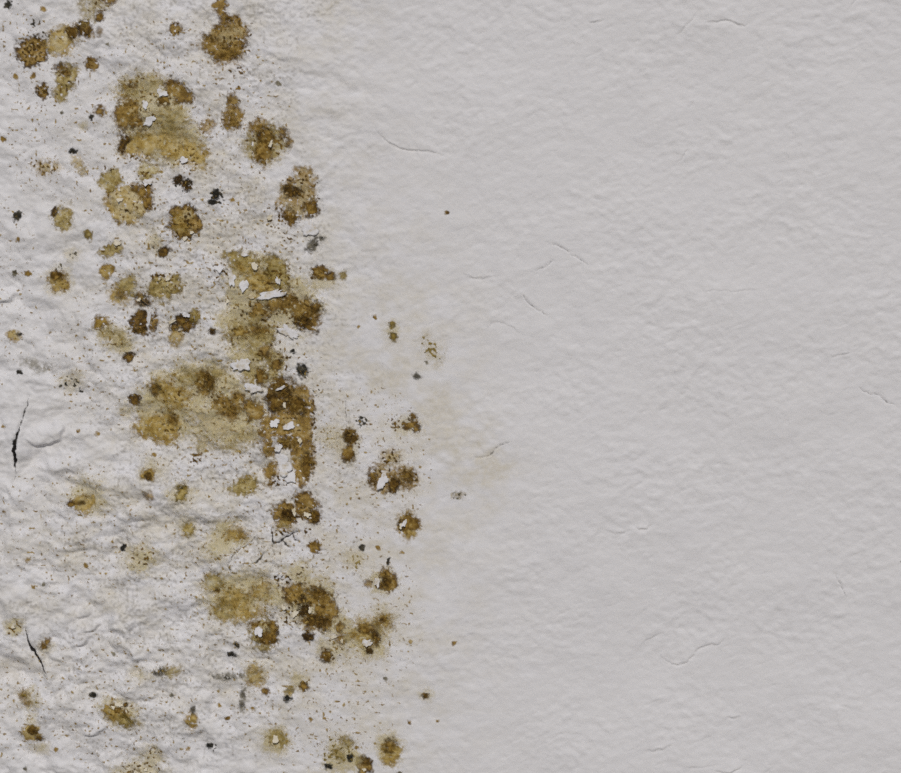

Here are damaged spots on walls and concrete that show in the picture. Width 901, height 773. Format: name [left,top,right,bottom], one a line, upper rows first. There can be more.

leakage [2,0,116,138]
leakage [30,153,58,183]
leakage [7,325,24,341]
leakage [47,0,432,773]
crack [11,405,28,467]
crack [25,630,45,672]
leakage [0,668,62,750]